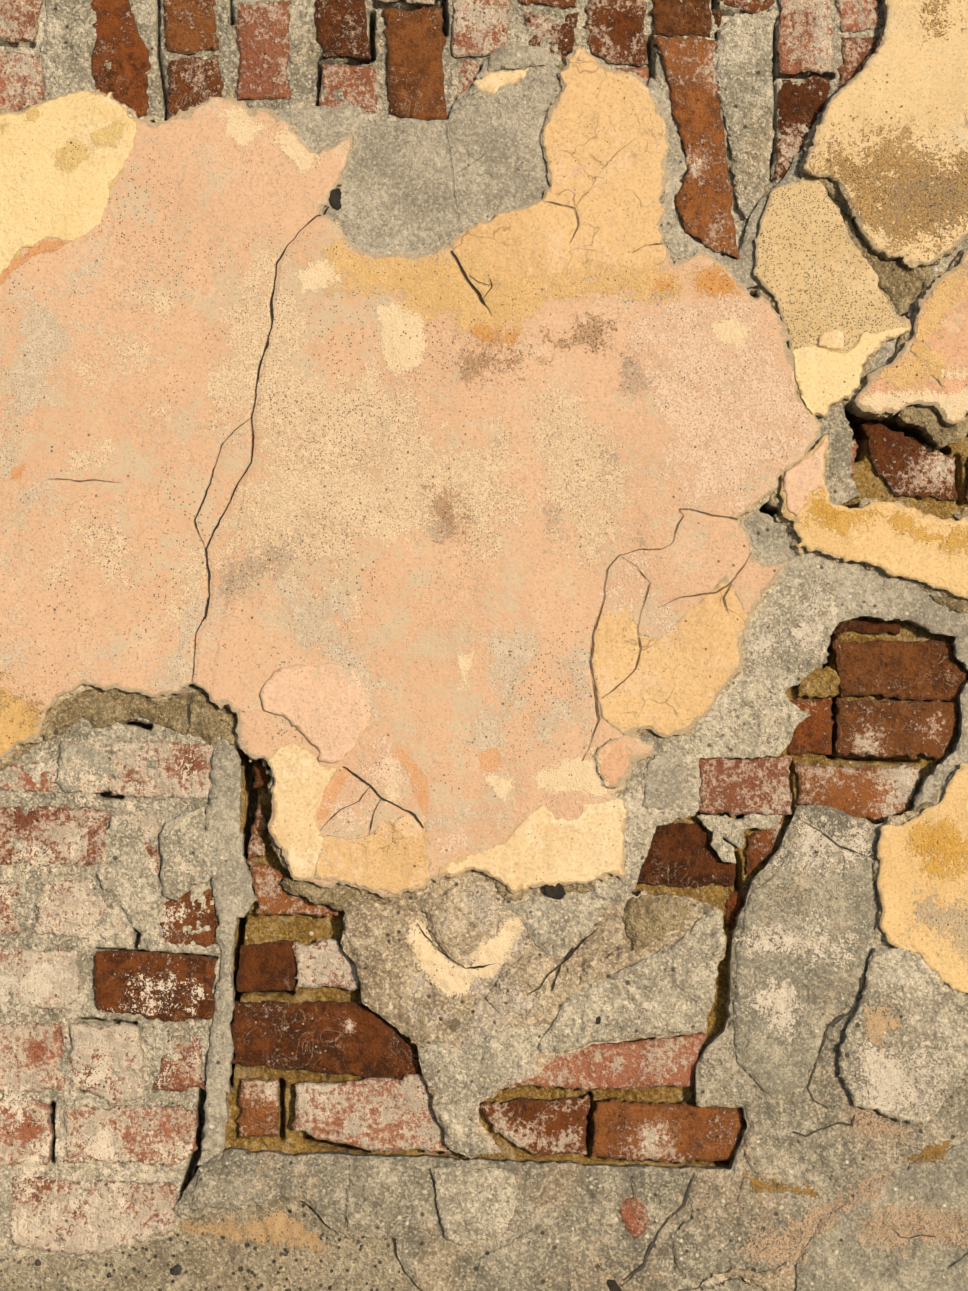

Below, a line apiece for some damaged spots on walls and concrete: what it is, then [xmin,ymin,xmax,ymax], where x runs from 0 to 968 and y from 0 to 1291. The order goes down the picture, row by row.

peeling [452,0,884,294]
crack [186,207,329,736]
peeling [0,0,748,1260]
spalling [631,617,958,1056]
peeling [784,437,827,516]
peeling [792,328,968,521]